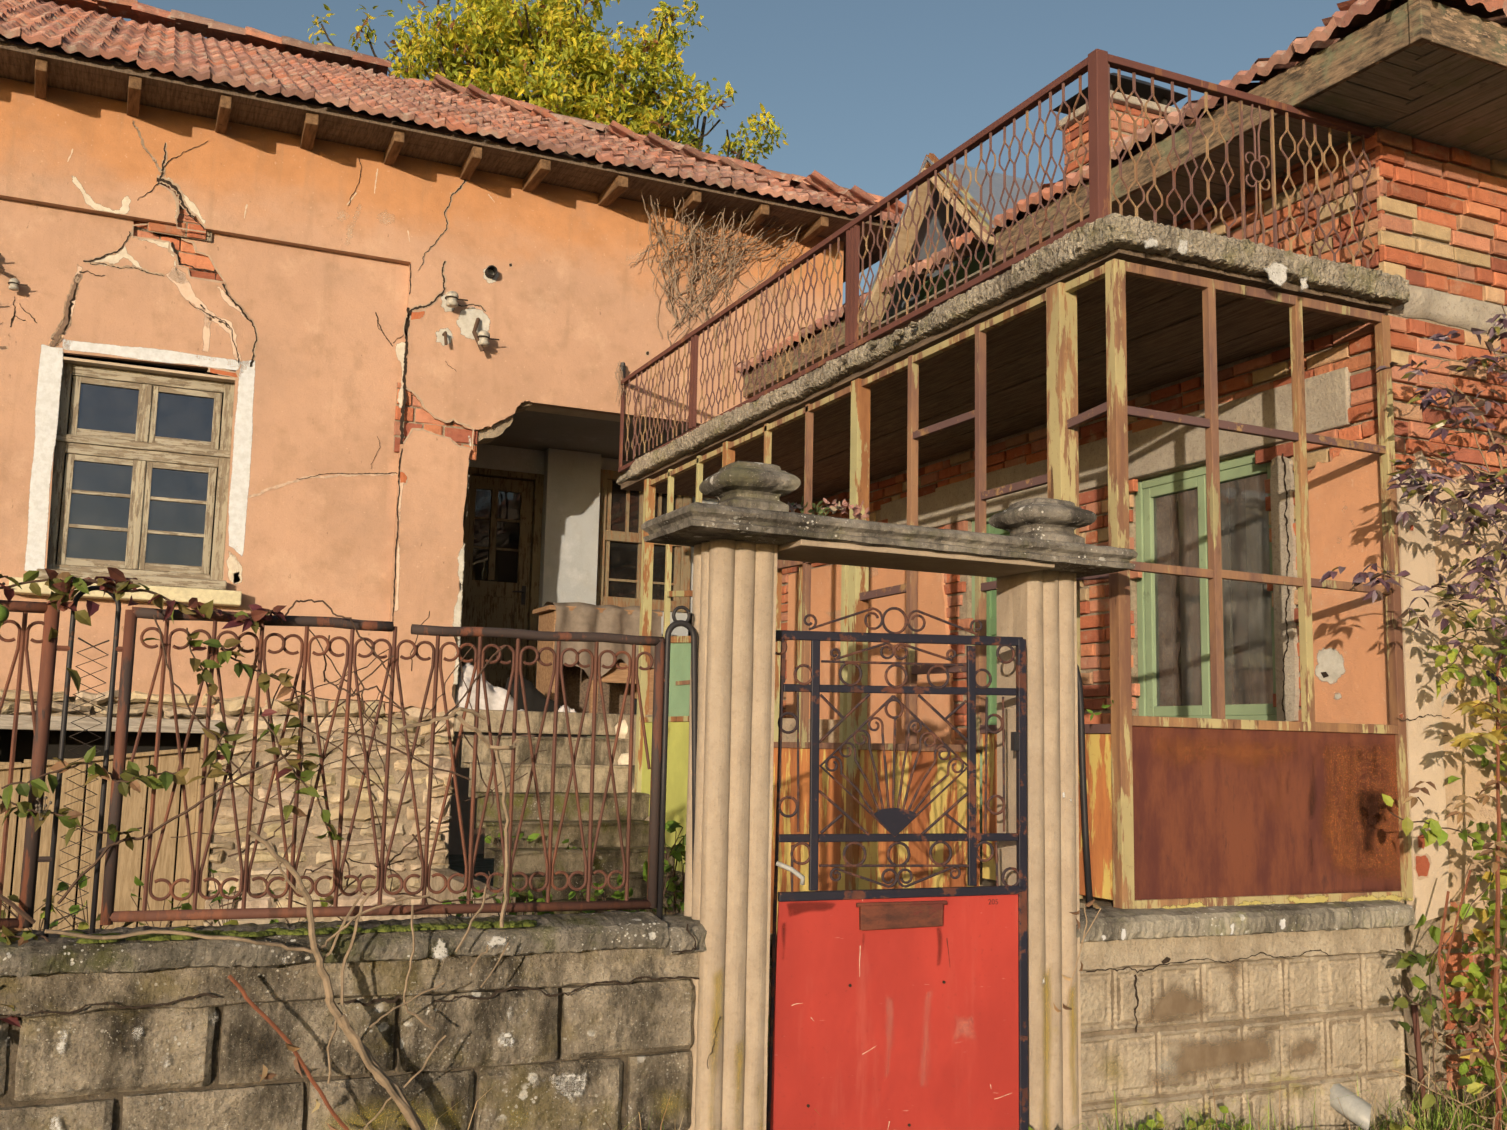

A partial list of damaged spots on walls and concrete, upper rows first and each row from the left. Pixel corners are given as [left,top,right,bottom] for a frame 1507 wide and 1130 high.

crack [1,121,259,367]
spalling [61,176,245,379]
crack [248,180,486,626]
spalling [393,342,478,461]
spalling [398,470,408,522]
flaking render [452,545,465,684]
crack [1270,454,1300,721]
corrosion [1310,750,1399,872]
leakage [1147,988,1207,1022]
leakage [1152,1033,1271,1084]
leakage [1290,1040,1317,1062]